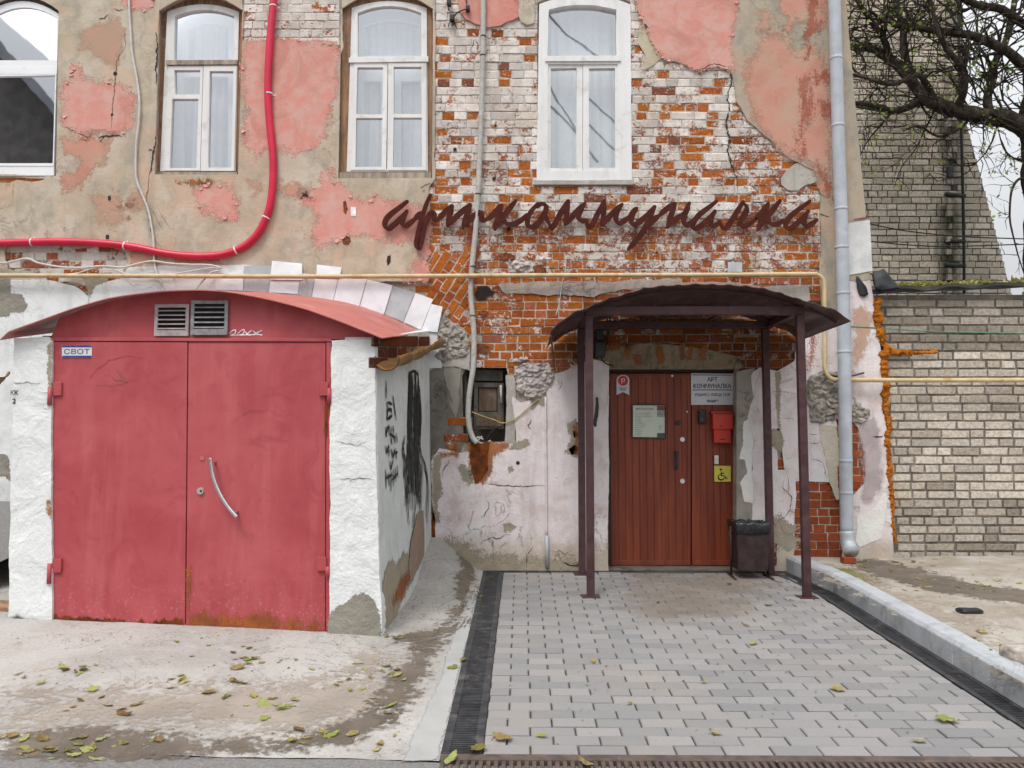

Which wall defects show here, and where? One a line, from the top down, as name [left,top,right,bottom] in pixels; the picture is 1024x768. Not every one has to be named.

crack [68,9,126,143]
peeling [55,0,155,226]
peeling [239,0,341,160]
crack [700,63,738,190]
flaking render [279,0,832,470]
spalling [326,417,473,636]
peeling [739,419,754,503]
flaking render [763,419,842,566]
flaking render [852,421,865,494]
corrosion [53,614,125,622]
corrosion [139,566,325,632]